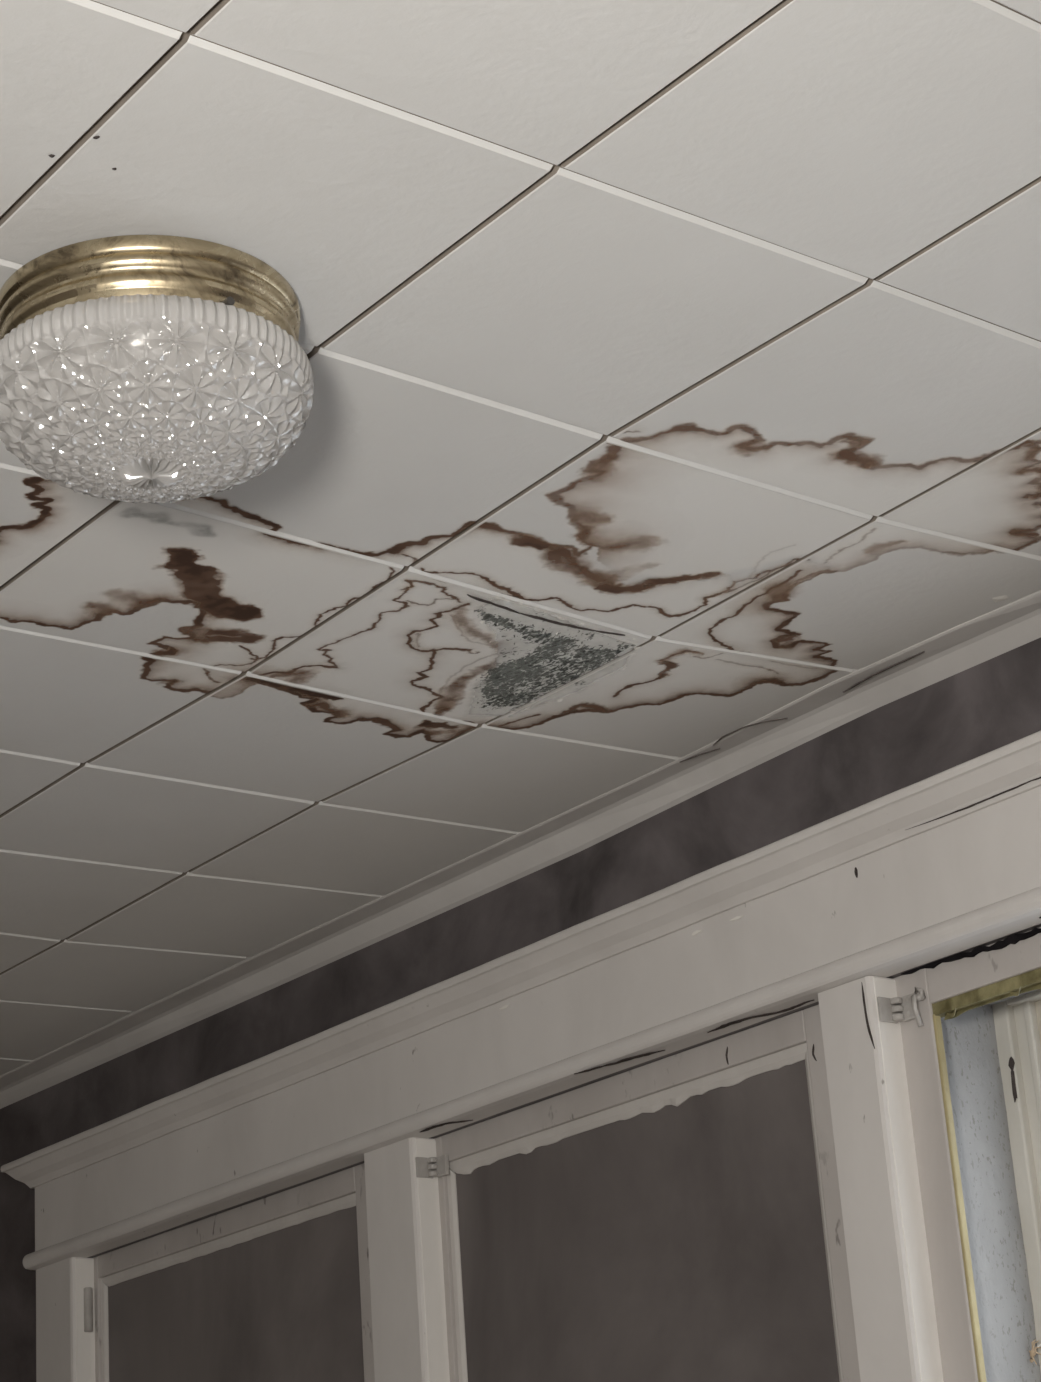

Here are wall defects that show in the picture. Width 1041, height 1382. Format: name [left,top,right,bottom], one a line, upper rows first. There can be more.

water stain [0,423,1041,743]